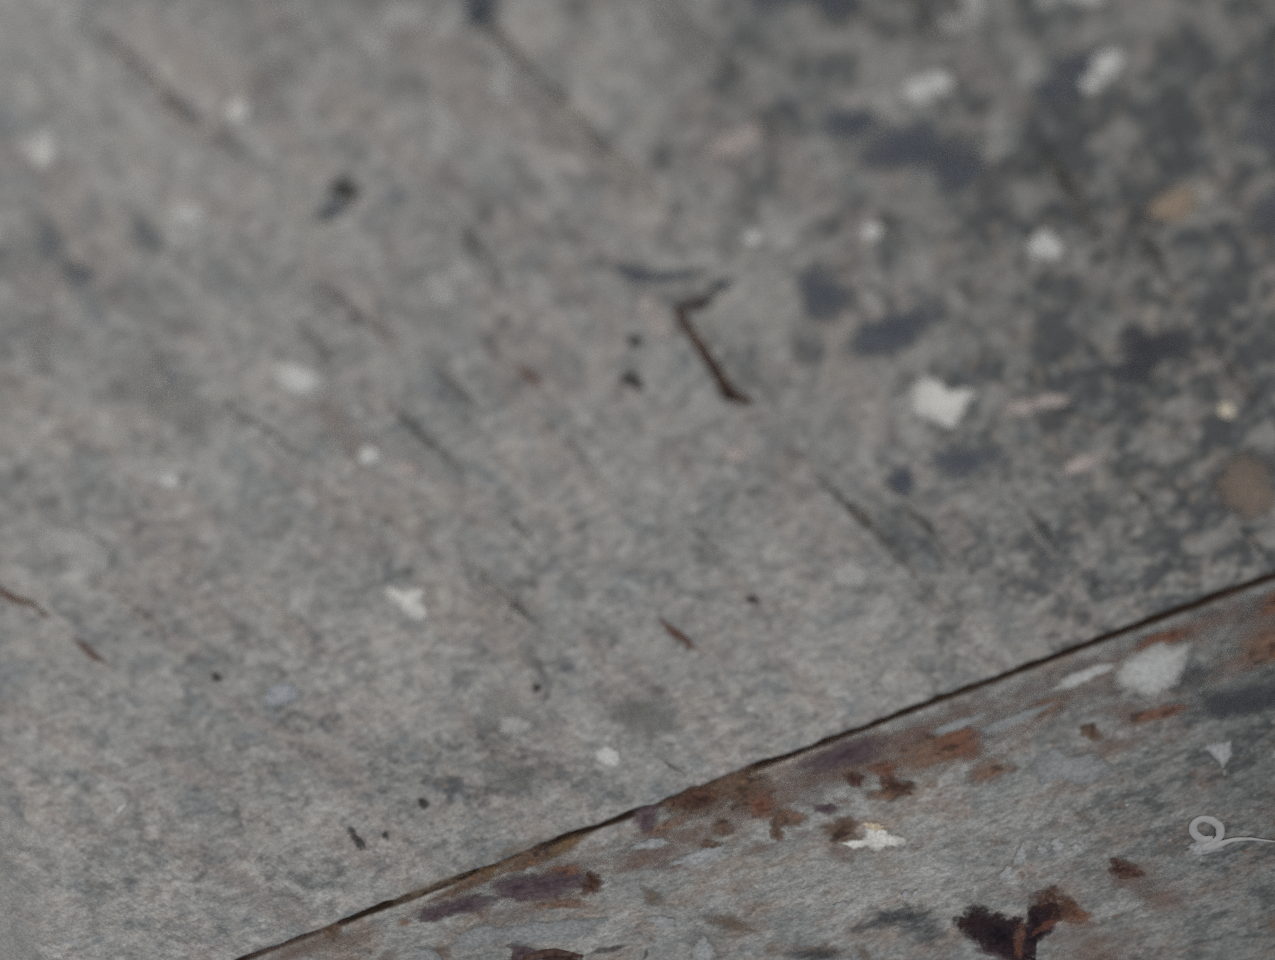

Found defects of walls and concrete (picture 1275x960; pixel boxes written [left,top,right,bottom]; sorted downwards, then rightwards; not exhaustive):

corrosion [1139,623,1207,650]
corrosion [803,727,1009,802]
corrosion [633,767,857,855]
corrosion [400,838,601,925]
corrosion [507,945,537,960]
corrosion [953,886,1091,960]